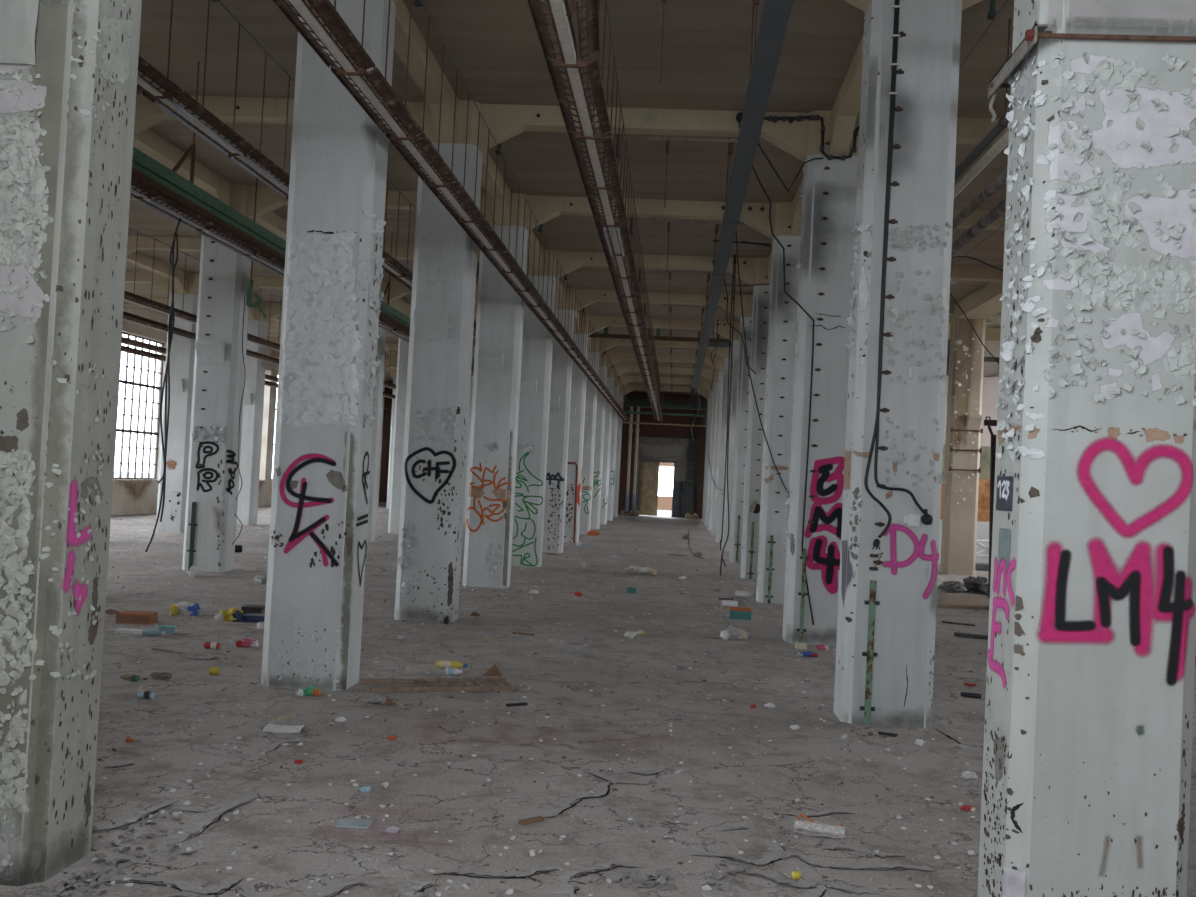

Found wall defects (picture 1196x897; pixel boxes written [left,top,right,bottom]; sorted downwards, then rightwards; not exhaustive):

peeling [995,0,1196,525]
peeling [279,209,386,428]
peeling [0,31,128,872]
crack [93,795,260,843]
crack [100,809,935,897]
crack [532,770,662,818]
crack [1010,803,1023,833]